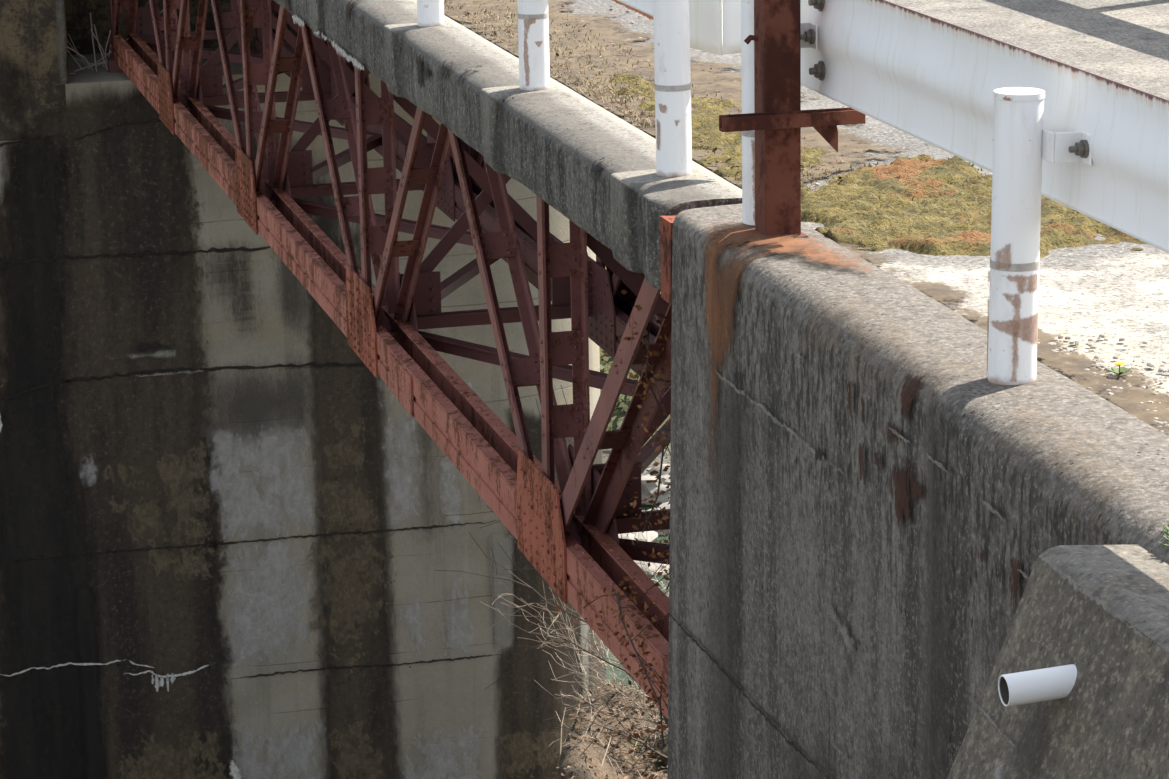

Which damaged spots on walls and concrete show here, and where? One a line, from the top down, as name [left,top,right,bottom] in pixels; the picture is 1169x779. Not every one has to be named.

rust [706,141,869,425]
crack [0,362,365,403]
damp [0,89,476,779]
damp [509,412,558,480]
rust [858,374,926,527]
crack [0,495,501,679]
damp [490,533,607,779]